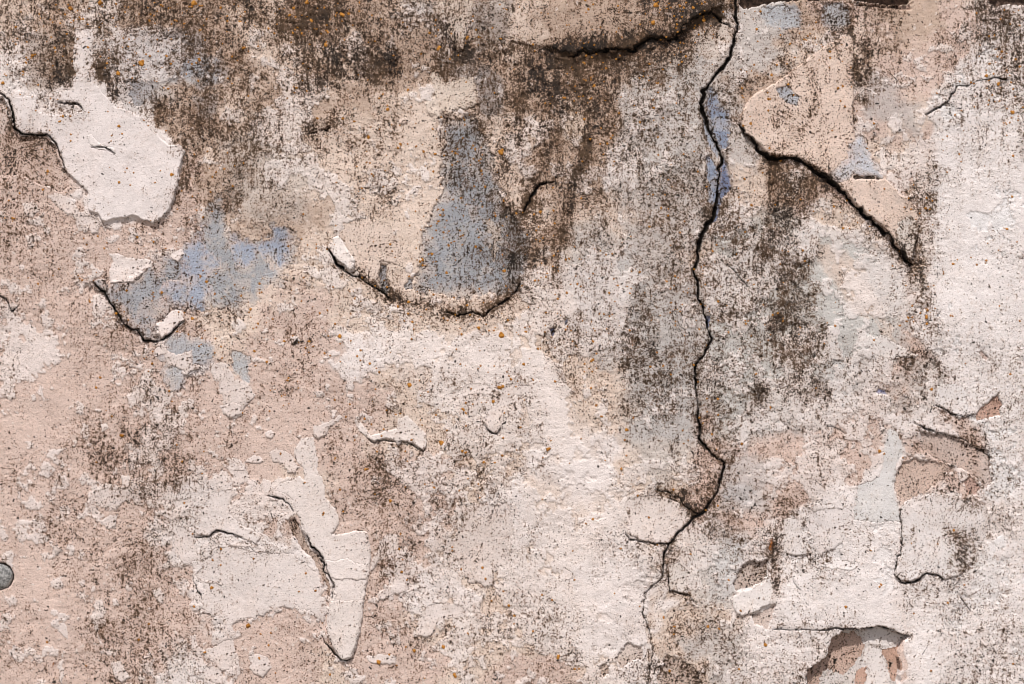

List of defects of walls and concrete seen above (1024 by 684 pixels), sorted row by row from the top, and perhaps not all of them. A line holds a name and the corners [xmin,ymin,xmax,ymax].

peeling [739,0,911,32]
peeling [0,29,186,234]
peeling [84,194,300,419]
peeling [332,218,402,296]
peeling [404,72,529,301]
crack [569,0,739,682]
crack [739,125,911,264]
peeling [935,384,1002,420]
peeling [171,415,427,684]
peeling [446,501,514,590]
peeling [783,429,1006,585]
spalling [806,626,908,684]